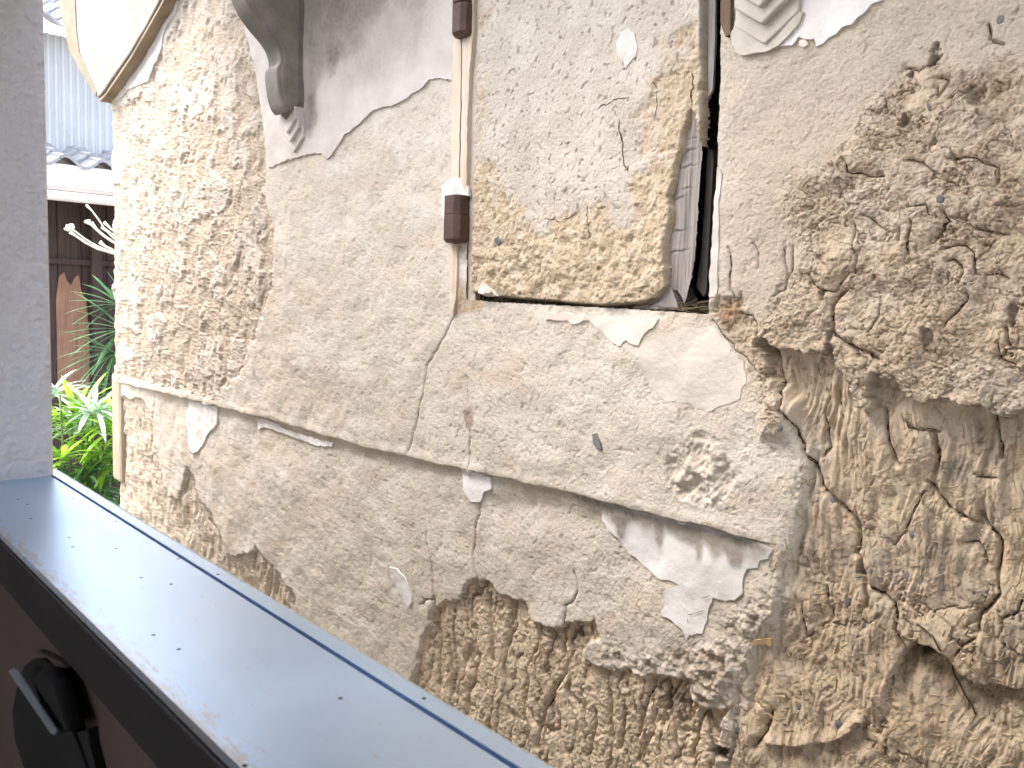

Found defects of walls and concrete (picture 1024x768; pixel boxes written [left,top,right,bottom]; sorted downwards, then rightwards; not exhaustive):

peeling [616,28,638,69]
peeling [780,0,882,48]
crack [599,98,628,171]
spalling [109,0,453,614]
peeling [478,283,498,297]
peeling [542,312,658,346]
spalling [412,326,1024,768]
crack [778,369,901,638]
crack [887,408,1024,653]